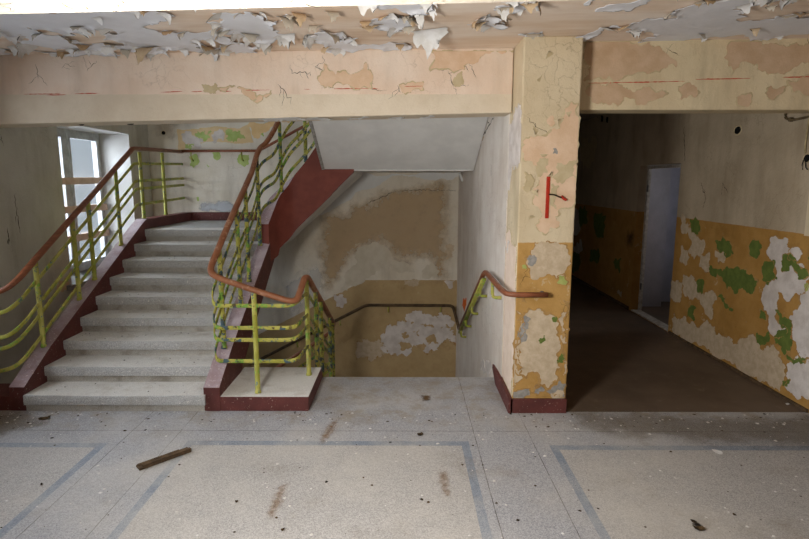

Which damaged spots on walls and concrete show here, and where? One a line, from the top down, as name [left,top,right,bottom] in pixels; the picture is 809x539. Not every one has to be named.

peeling [0,4,514,91]
peeling [467,1,542,33]
peeling [575,0,809,107]
peeling [177,117,332,154]
peeling [502,101,583,398]
peeling [355,310,456,362]
peeling [670,214,809,405]